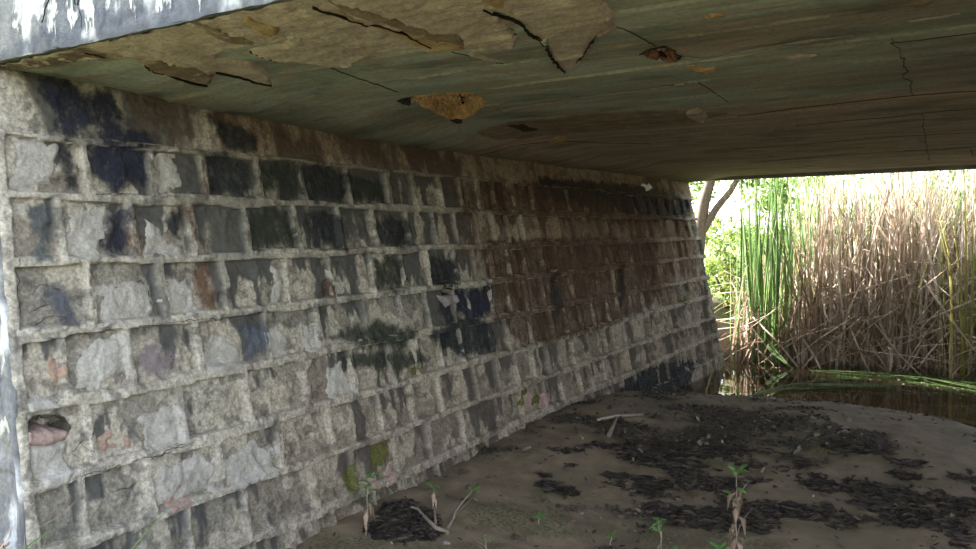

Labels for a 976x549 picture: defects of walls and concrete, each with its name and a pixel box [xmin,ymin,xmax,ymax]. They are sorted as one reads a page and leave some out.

peeling [0,0,617,85]
crack [312,6,503,64]
crack [483,9,656,74]
damp [1,25,156,193]
spalling [397,92,486,124]
crack [698,33,976,163]
damp [205,114,391,252]
damp [374,215,411,293]
peeling [47,278,202,391]
damp [331,320,430,375]
damp [430,256,496,357]
spalling [27,393,74,491]